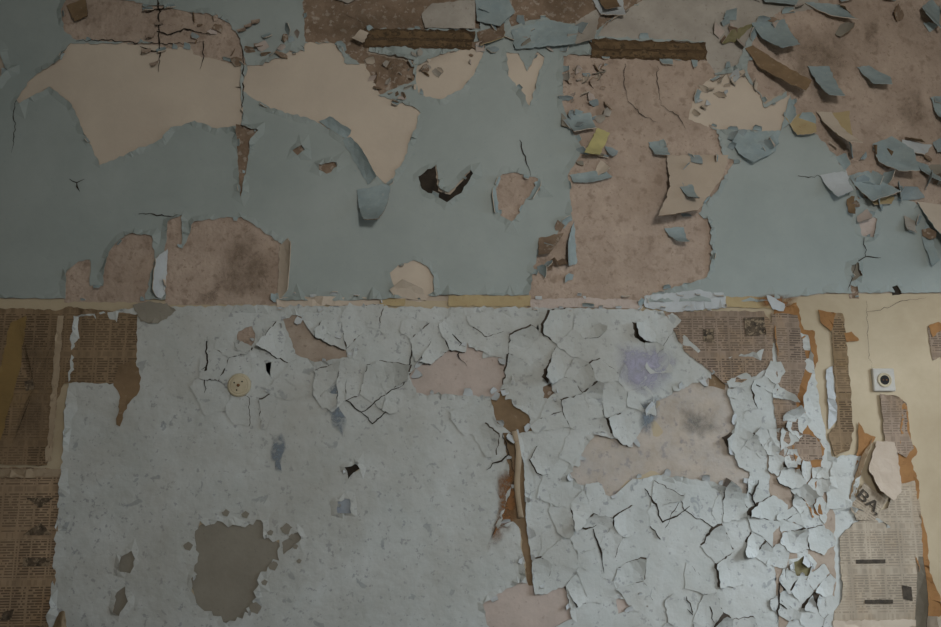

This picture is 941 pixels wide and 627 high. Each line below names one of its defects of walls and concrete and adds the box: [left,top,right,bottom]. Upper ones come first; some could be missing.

crack [79,0,205,72]
peeling [17,0,260,196]
flaking render [242,0,941,312]
peeling [64,216,861,627]
crack [645,489,690,523]
crack [746,480,759,507]
crack [582,525,604,571]
crack [776,583,787,622]